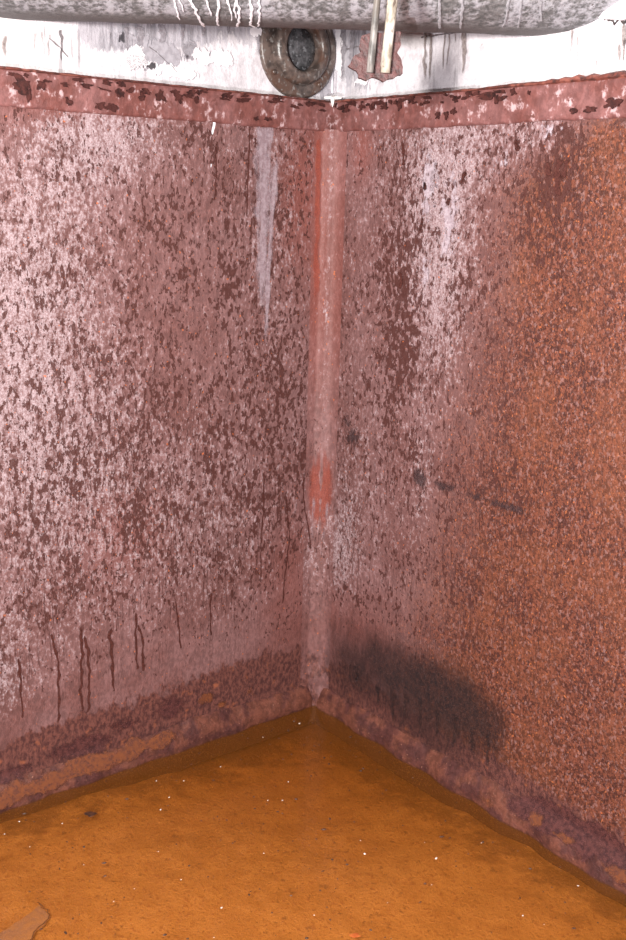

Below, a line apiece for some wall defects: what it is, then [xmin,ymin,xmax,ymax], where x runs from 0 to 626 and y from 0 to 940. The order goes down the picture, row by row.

leakage [173,0,261,52]
rust [7,72,208,112]
rust [220,92,252,103]
rust [268,88,531,120]
rust [569,97,623,114]
efflorescence [256,127,277,324]
rust [50,634,61,722]
rust [78,628,91,713]
rust [107,628,115,691]
rust [134,613,145,671]
leakage [339,641,498,760]
rust [0,719,175,810]